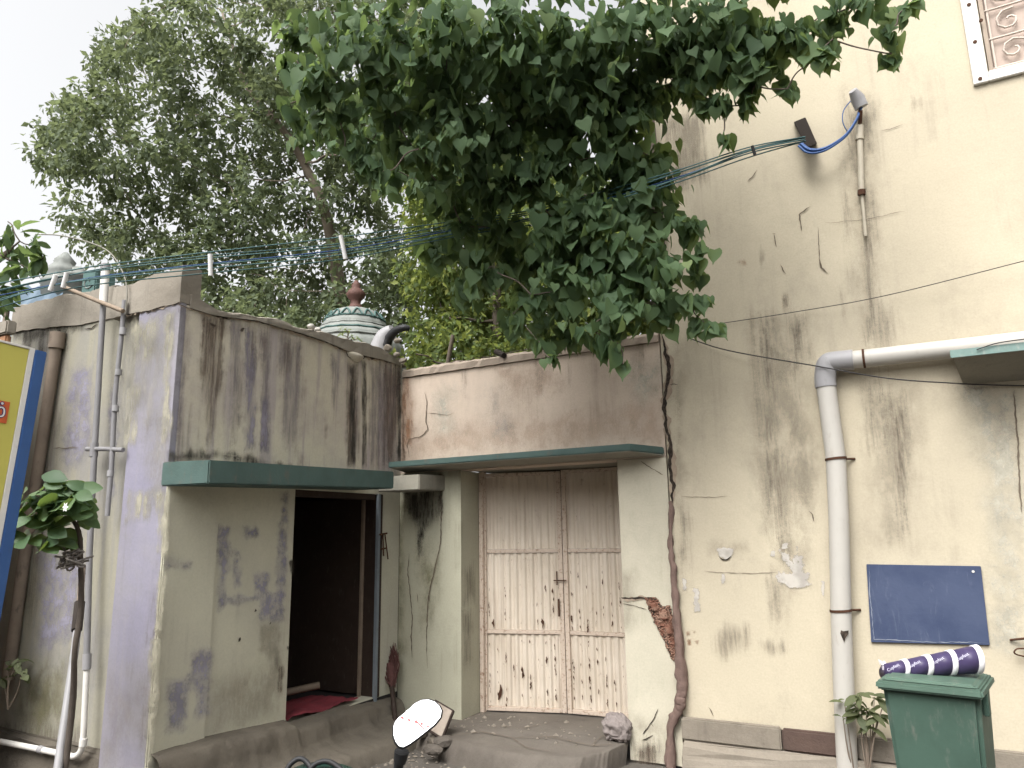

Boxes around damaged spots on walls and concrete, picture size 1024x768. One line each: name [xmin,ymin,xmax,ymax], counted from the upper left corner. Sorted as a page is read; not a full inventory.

water stain [169,450,210,460]
water stain [201,318,268,463]
water stain [347,364,412,465]
crack [402,394,451,454]
crack [641,335,724,503]
water stain [406,491,443,547]
crack [407,493,442,654]
peeling [770,543,825,596]
corrosion [489,643,532,706]
corrosion [571,583,624,707]
spalling [645,597,675,661]